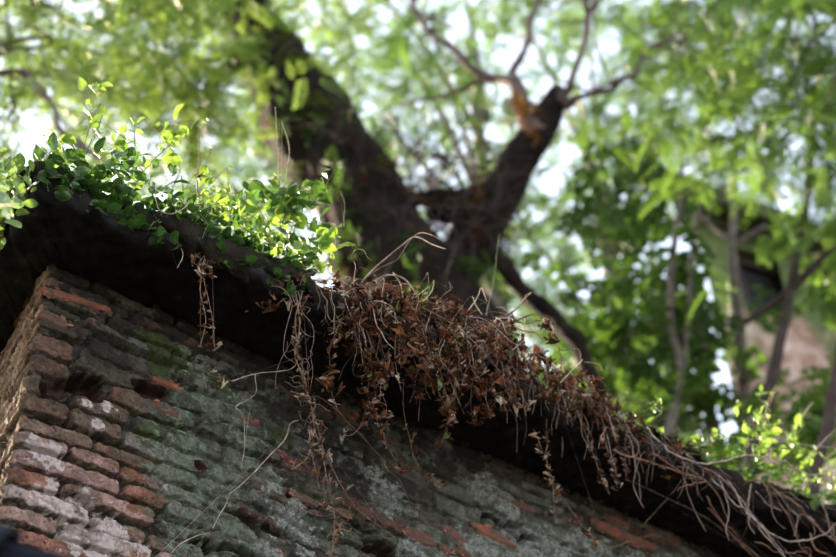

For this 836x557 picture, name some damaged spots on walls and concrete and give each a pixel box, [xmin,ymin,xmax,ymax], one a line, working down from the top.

spalling [38,372,106,403]
water stain [54,270,542,507]